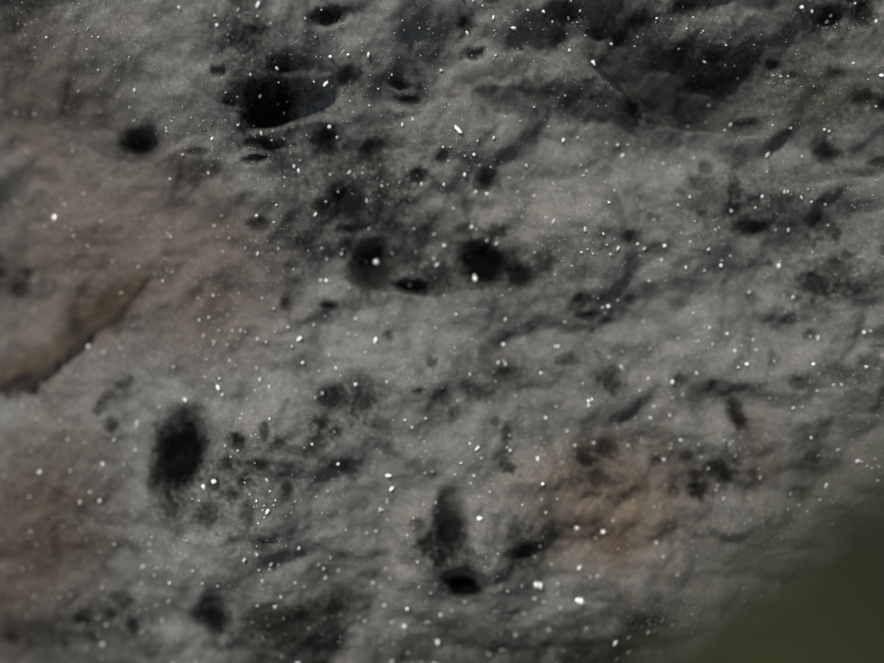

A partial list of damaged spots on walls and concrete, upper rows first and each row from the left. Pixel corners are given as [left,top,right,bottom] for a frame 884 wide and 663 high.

leakage [0,0,58,22]
leakage [0,34,256,358]
crack [0,275,146,397]
crack [93,376,131,414]